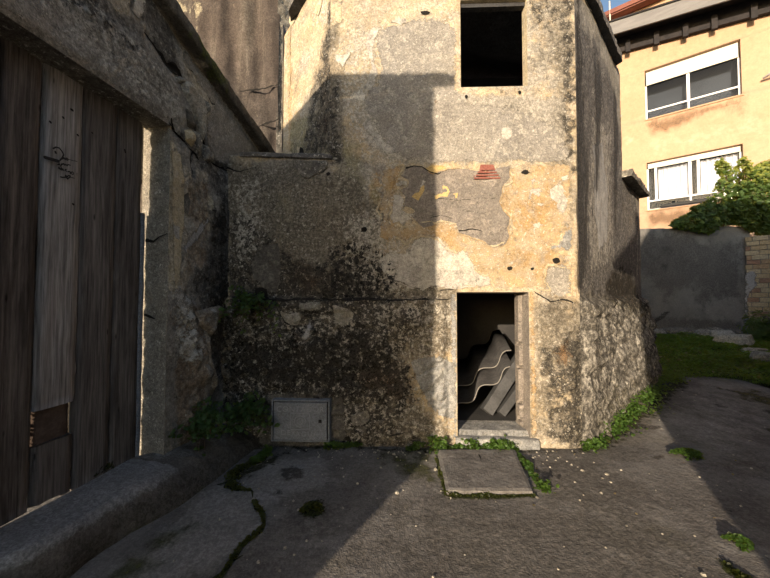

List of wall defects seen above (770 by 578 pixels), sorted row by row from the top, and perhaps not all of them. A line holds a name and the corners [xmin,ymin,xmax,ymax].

crack [144,32,256,174]
spalling [334,50,350,67]
spalling [356,17,572,291]
damp [576,23,618,292]
damp [294,241,404,301]
crack [264,287,454,327]
damp [606,267,649,314]
damp [224,310,415,406]